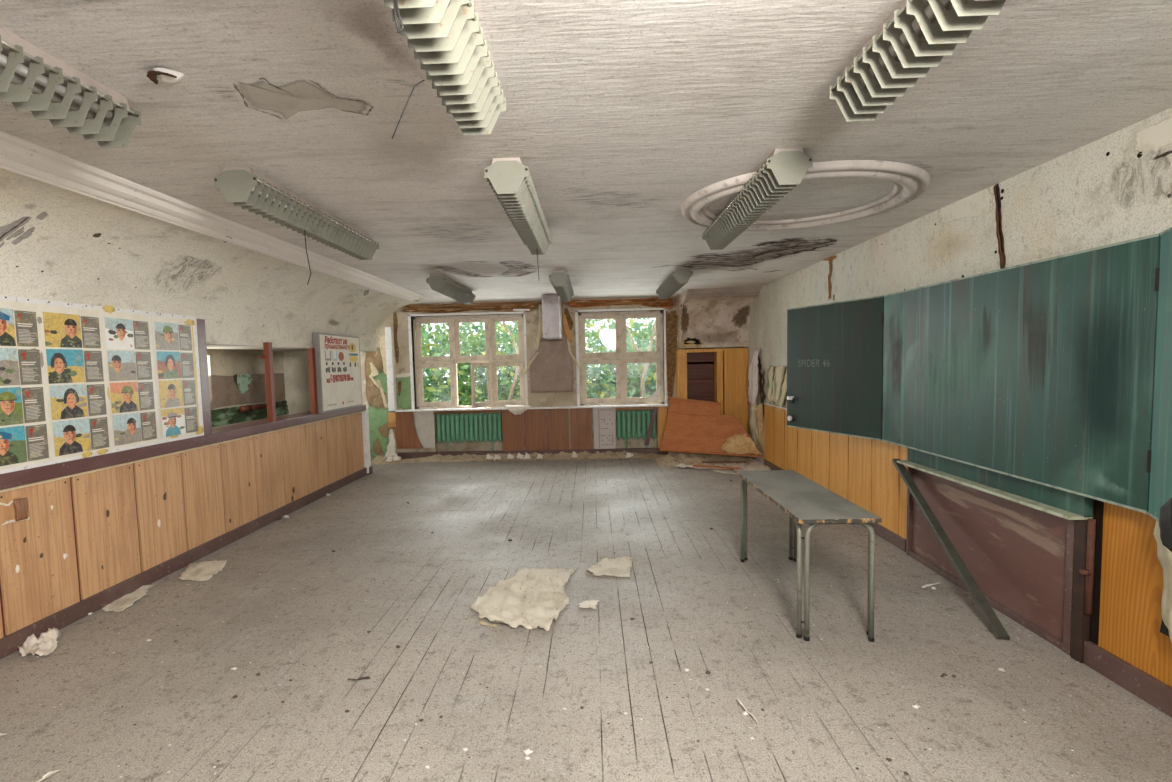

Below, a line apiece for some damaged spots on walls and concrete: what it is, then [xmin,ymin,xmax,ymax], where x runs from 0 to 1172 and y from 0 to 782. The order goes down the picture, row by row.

flaking render [234,77,374,119]
peeling [0,212,47,248]
corrosion [824,255,837,300]